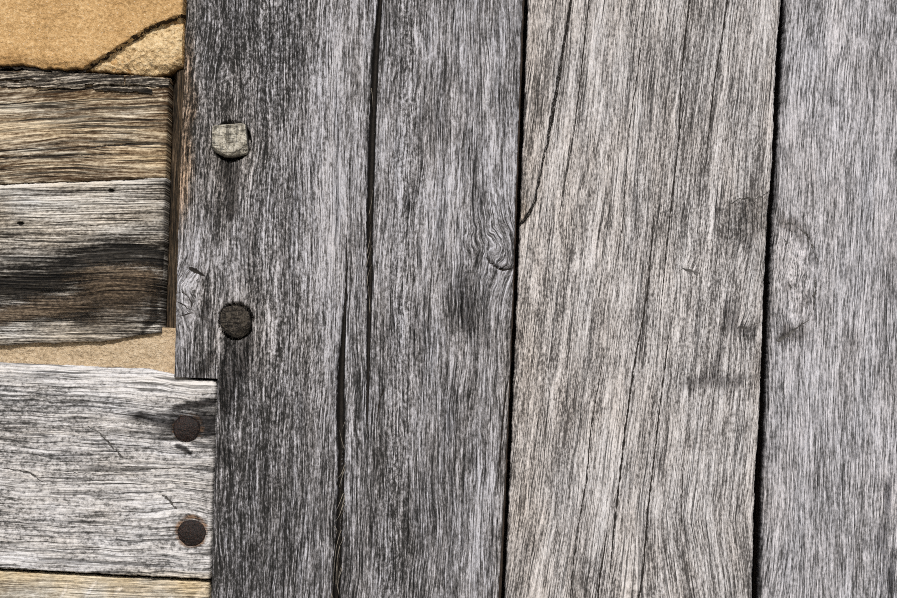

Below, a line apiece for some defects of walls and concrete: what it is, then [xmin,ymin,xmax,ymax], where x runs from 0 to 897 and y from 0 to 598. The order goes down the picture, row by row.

crack [518,0,590,227]